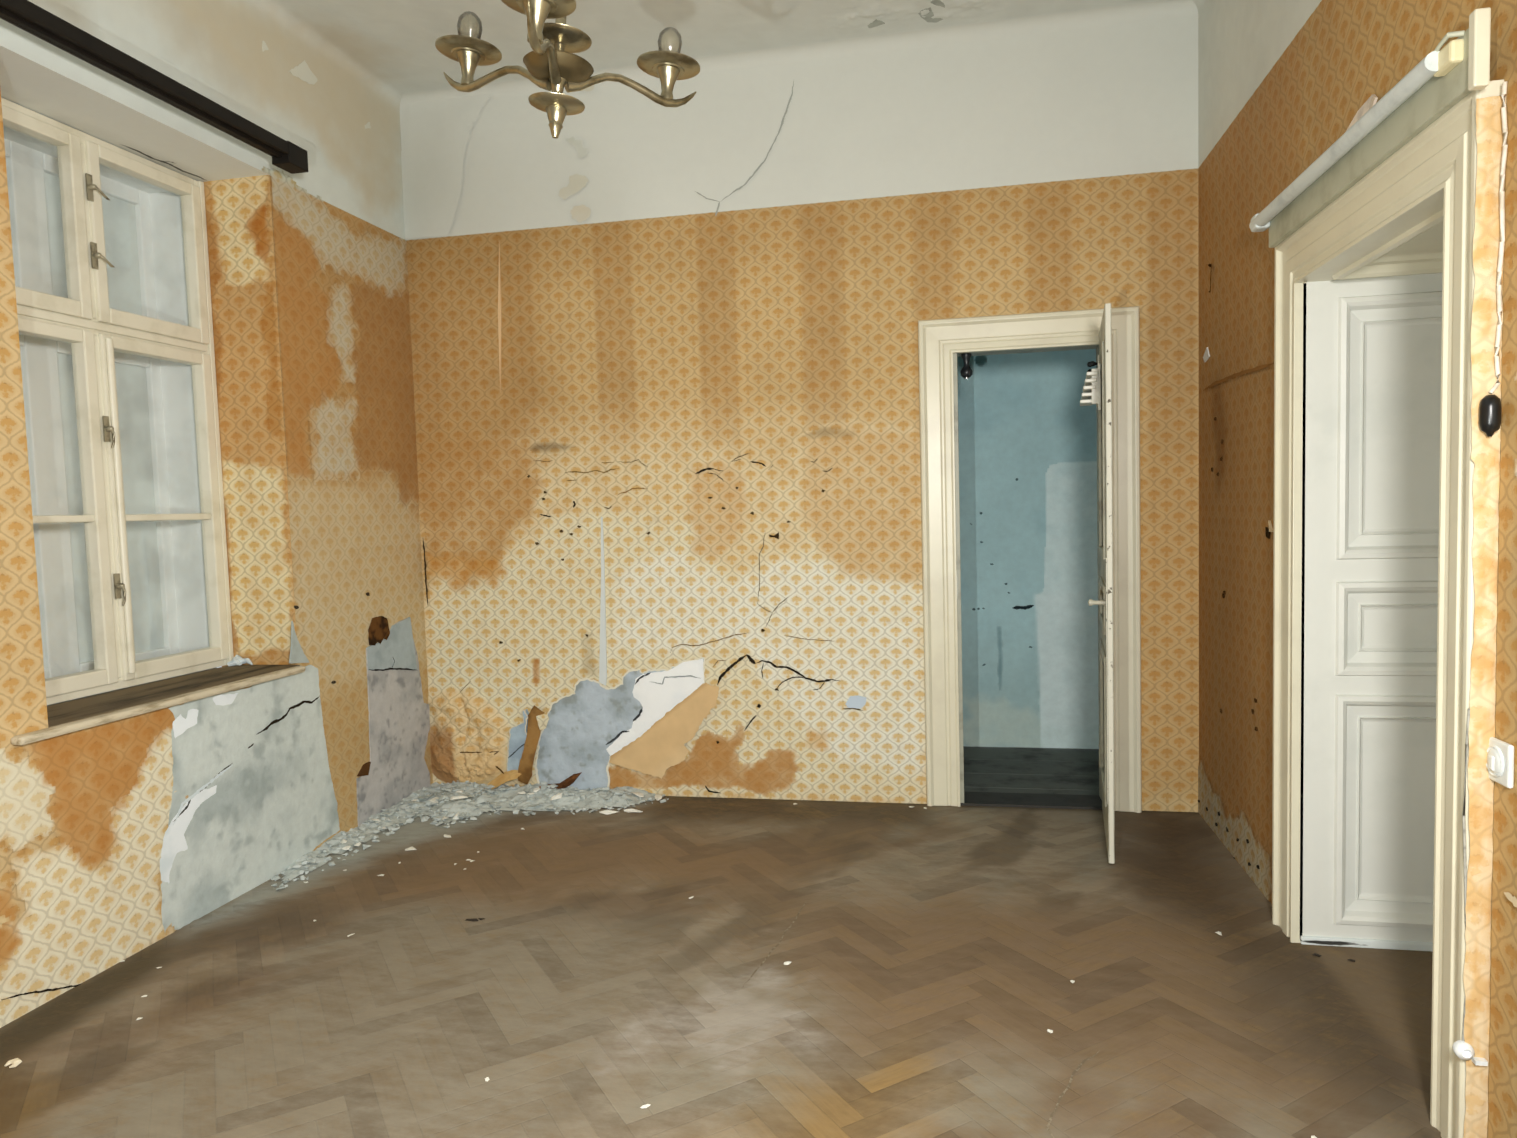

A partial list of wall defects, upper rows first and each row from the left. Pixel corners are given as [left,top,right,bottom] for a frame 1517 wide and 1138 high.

crack [695,80,794,216]
leakage [205,175,927,804]
leakage [0,703,188,1028]
crack [173,696,320,822]
flaking render [160,621,340,931]
flaking render [356,617,431,826]
flaking render [506,657,705,790]
crack [670,535,839,730]